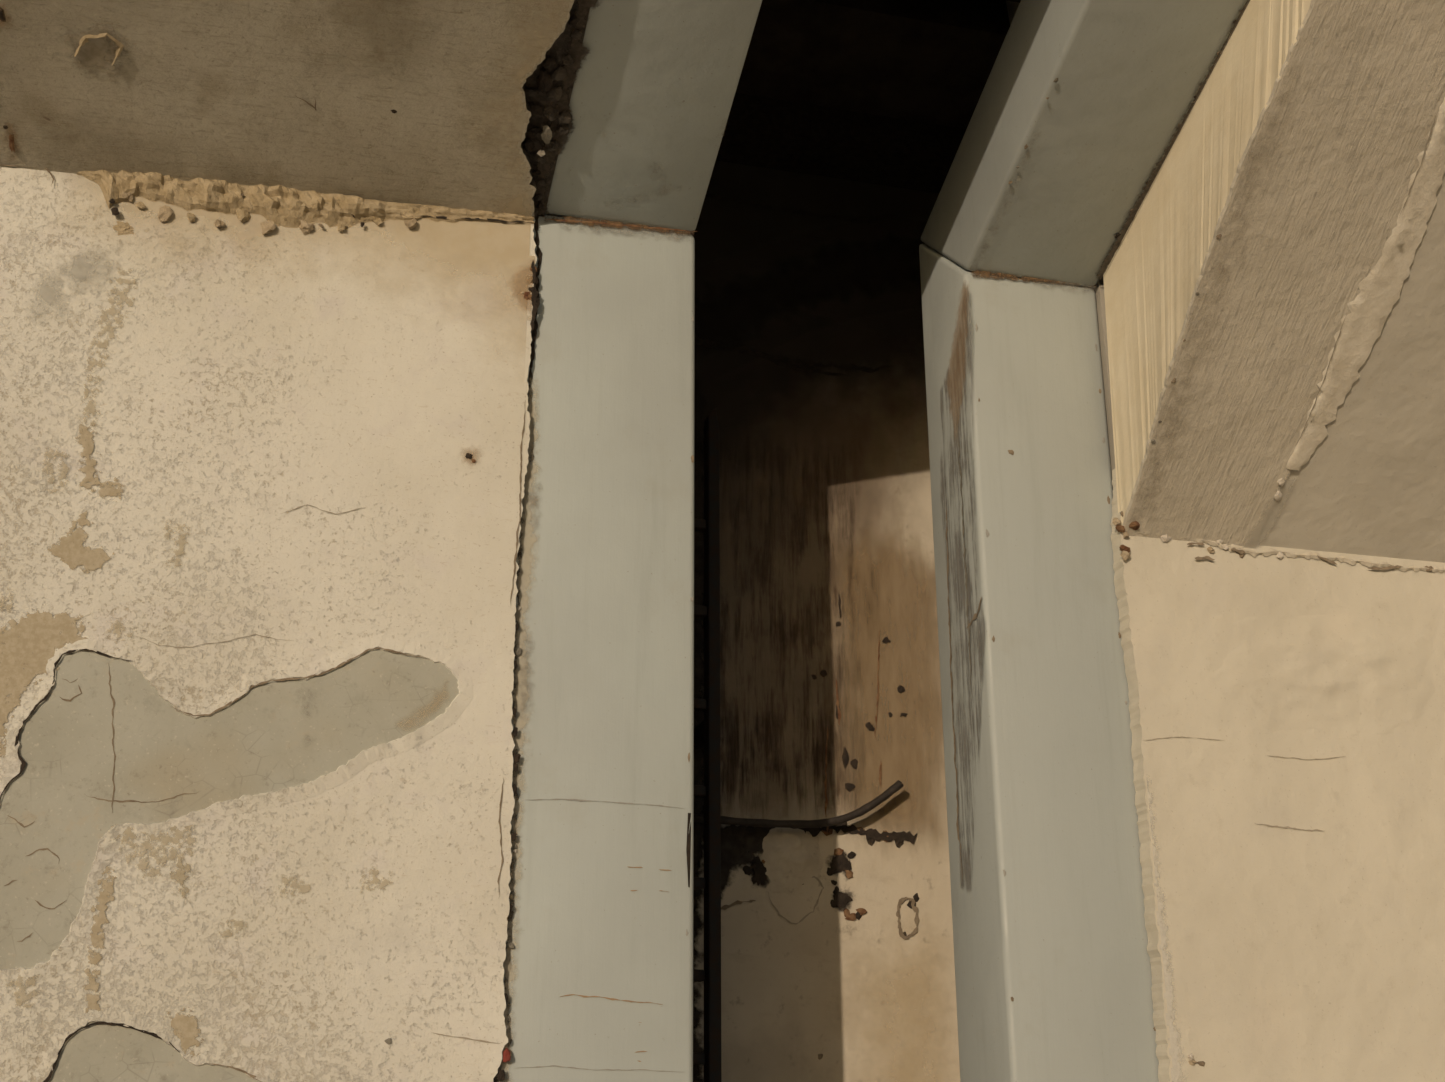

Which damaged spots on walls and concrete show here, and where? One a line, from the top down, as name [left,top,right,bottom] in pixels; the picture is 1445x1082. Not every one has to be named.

spalling [522,0,599,218]
crack [422,215,542,1082]
peeling [0,593,473,1082]
spalling [686,813,704,887]
flaking render [721,825,775,899]
flaking render [792,822,917,921]